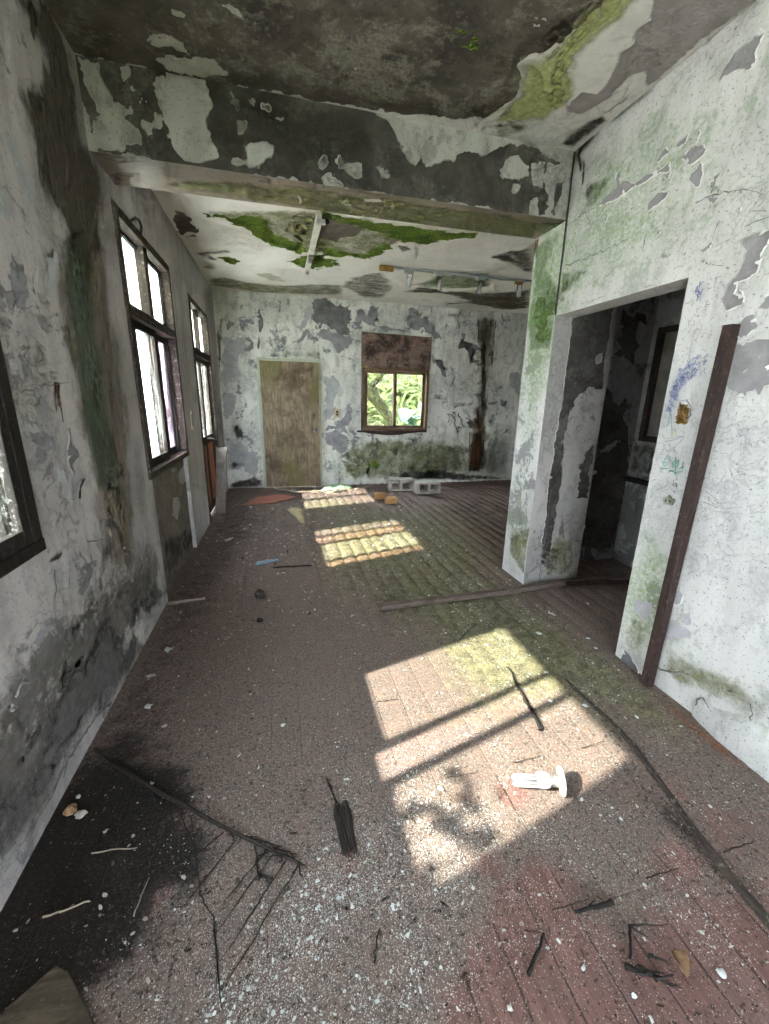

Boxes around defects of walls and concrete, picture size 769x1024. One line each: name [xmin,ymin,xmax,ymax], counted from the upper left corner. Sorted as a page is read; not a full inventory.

peeling [564,0,755,115]
peeling [718,28,766,83]
peeling [75,55,565,217]
peeling [599,129,707,223]
peeling [220,309,264,419]
peeling [227,441,263,475]
leakage [21,0,605,572]
peeling [324,375,352,453]
peeling [297,298,441,353]
peeling [436,359,446,377]
peeling [541,307,647,556]
peeling [721,229,769,397]